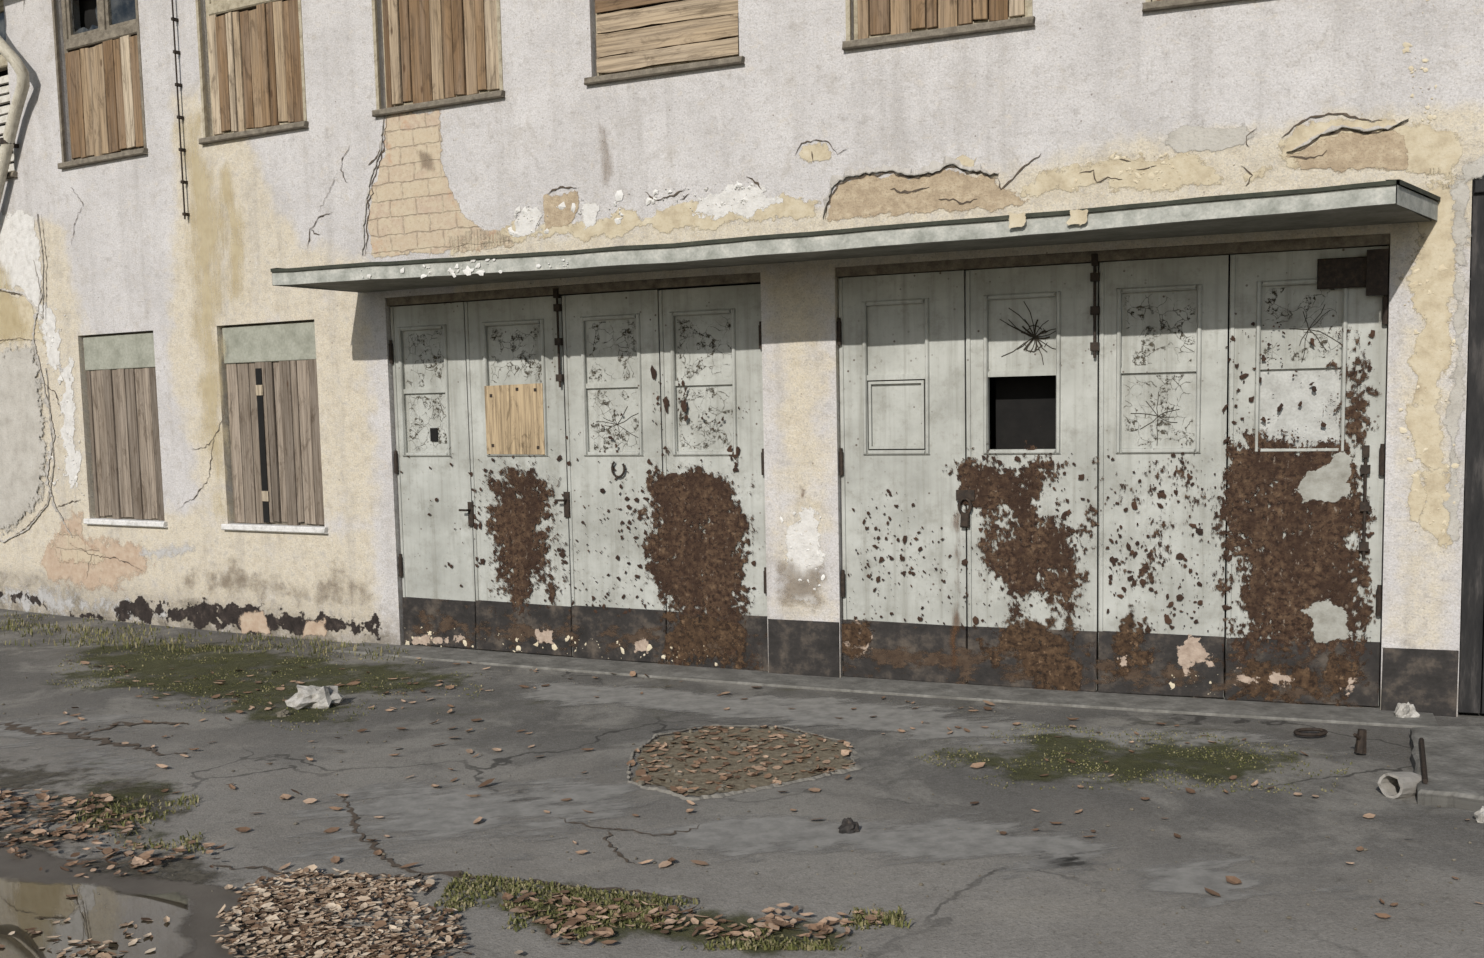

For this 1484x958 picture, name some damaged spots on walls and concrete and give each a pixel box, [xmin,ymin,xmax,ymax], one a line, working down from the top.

flaking render [0,210,381,640]
crack [307,148,349,248]
corrosion [429,366,763,670]
flaking render [360,42,1484,549]
corrosion [842,322,1383,706]